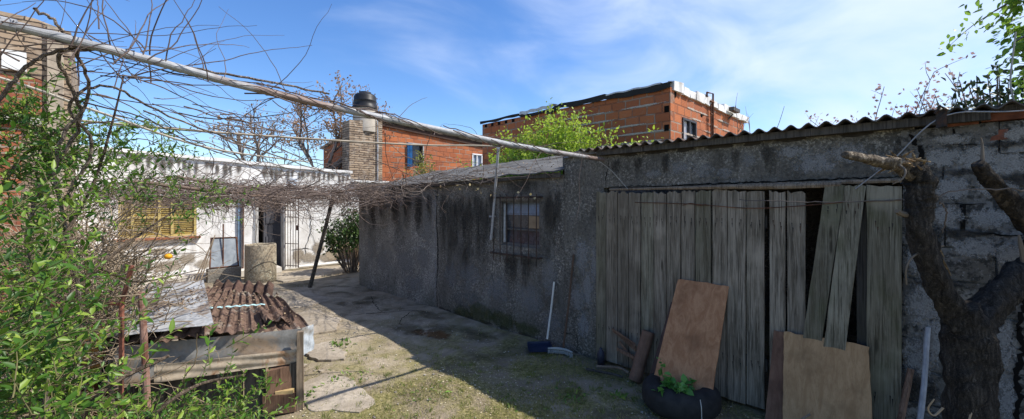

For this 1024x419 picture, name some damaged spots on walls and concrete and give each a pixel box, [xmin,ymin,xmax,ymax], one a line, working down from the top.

leakage [362,194,493,290]
peeling [927,126,1024,264]